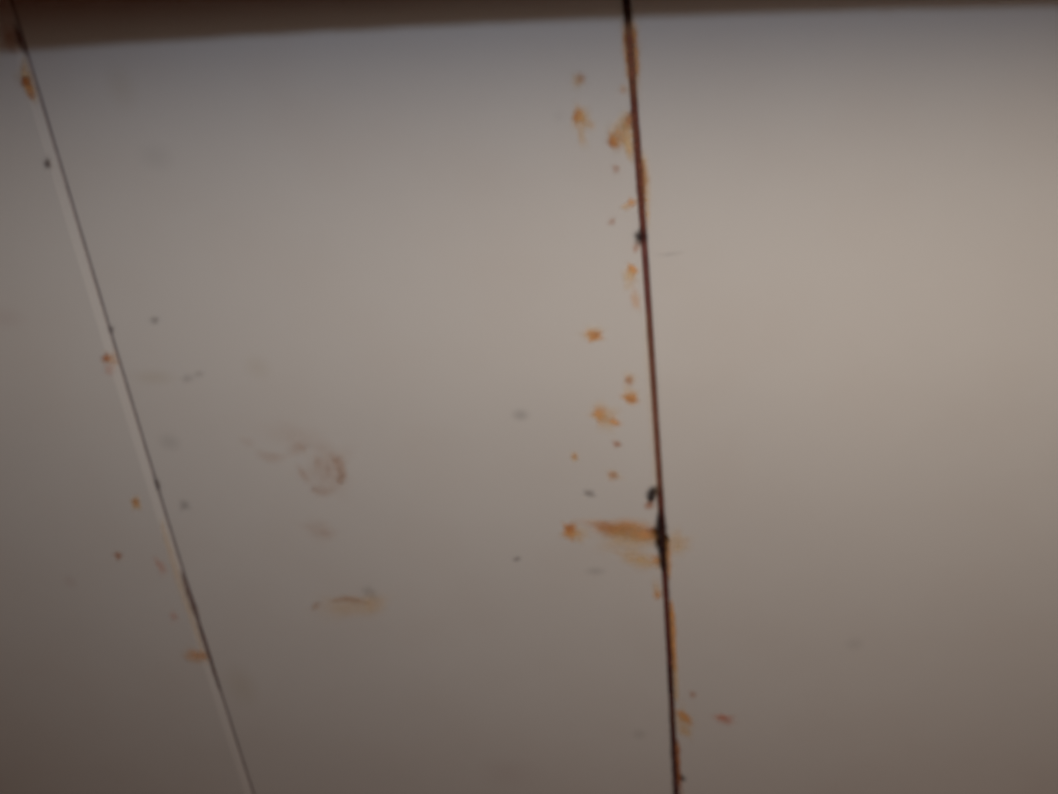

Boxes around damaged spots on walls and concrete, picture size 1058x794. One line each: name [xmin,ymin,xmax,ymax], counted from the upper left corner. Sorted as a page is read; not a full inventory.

rust [610,0,646,227]
rust [608,493,688,794]